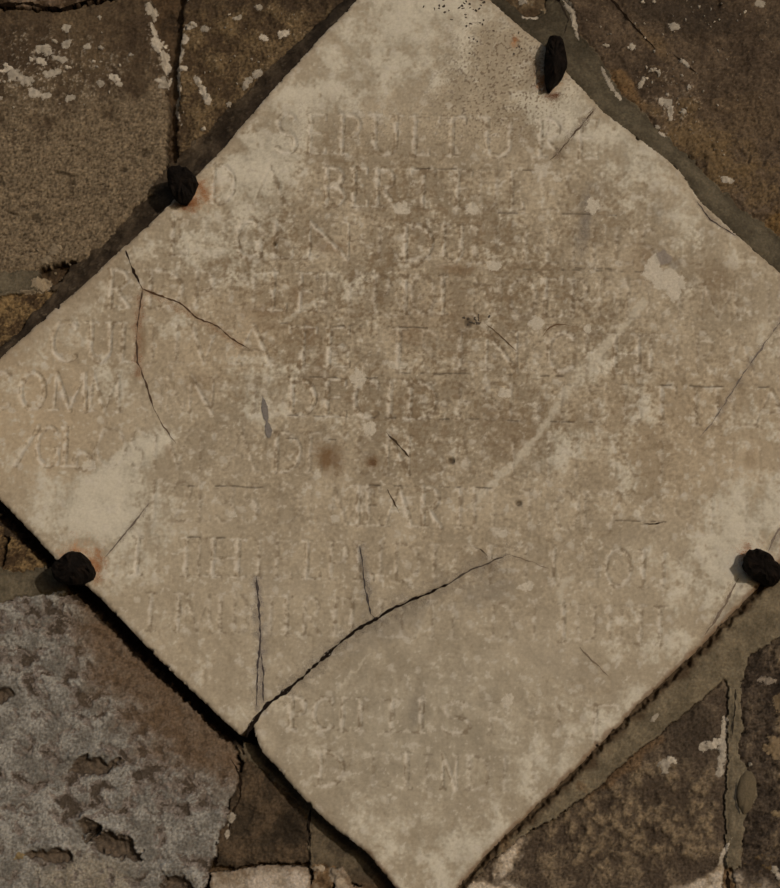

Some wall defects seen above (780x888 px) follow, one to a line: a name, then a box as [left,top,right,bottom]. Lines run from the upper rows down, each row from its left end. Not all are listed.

crack [0,0,113,12]
crack [557,0,569,35]
corrosion [171,168,220,220]
crack [125,251,249,443]
crack [703,318,780,433]
corrosion [52,530,120,595]
crack [246,537,549,737]
crack [228,760,243,834]